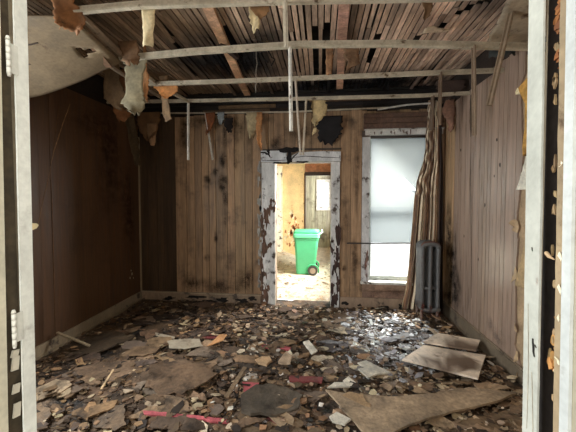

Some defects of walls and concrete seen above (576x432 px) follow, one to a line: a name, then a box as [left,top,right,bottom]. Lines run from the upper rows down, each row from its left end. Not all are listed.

peeling [235,161,276,304]
peeling [330,223,341,306]
flaking render [510,55,528,368]